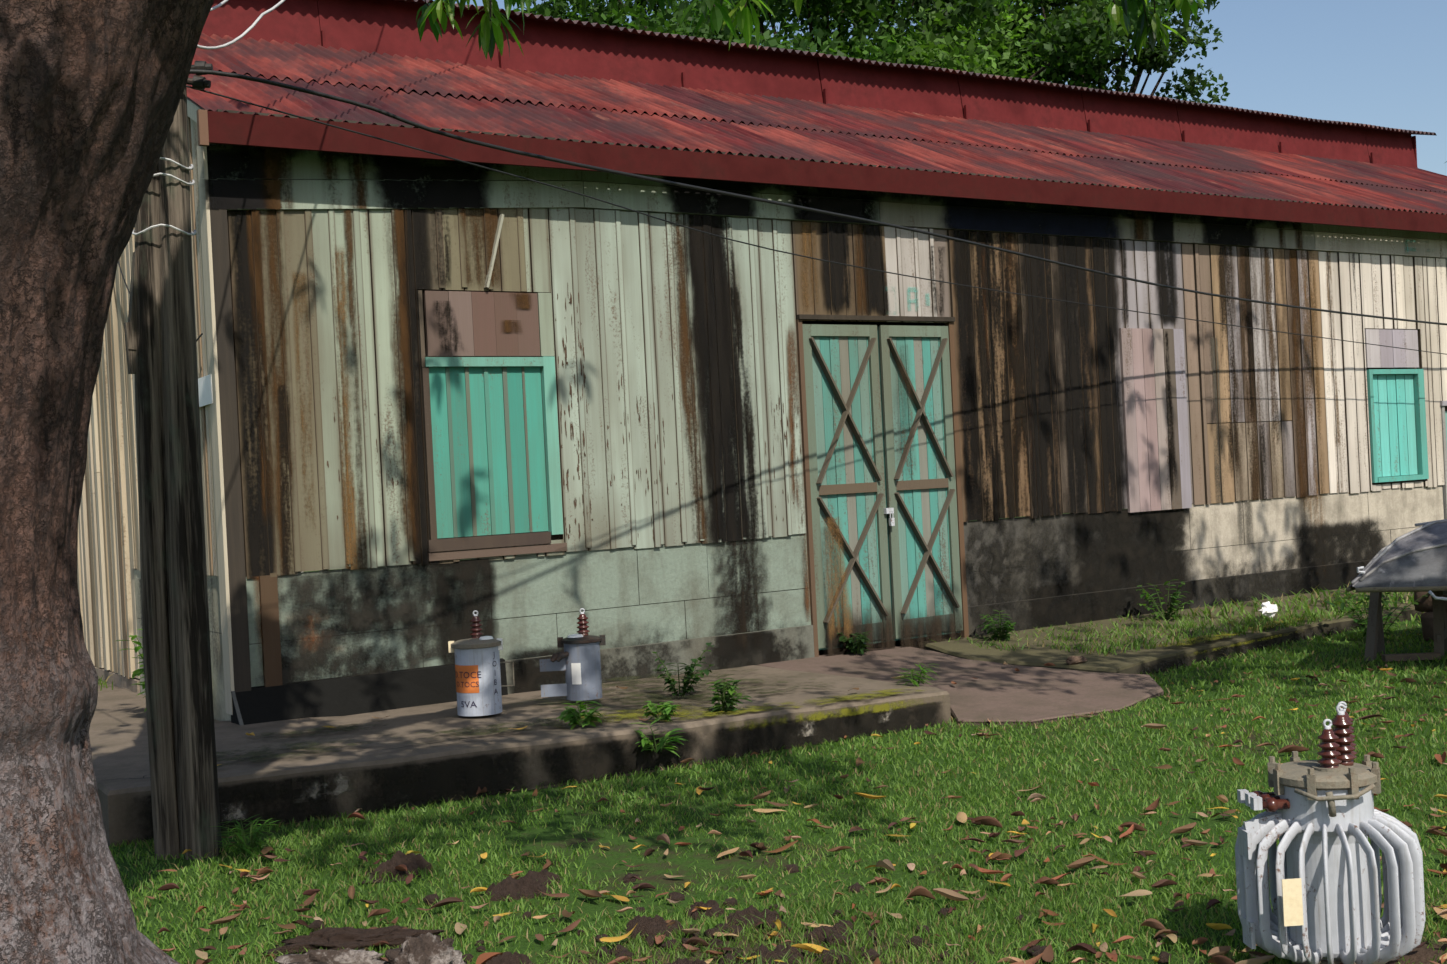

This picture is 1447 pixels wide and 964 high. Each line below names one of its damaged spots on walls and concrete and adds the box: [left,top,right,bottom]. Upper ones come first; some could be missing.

damp [504,293,531,332]
damp [205,143,504,685]
damp [663,176,1386,670]
damp [509,646,565,694]
damp [600,634,672,683]
damp [1137,657,1192,675]